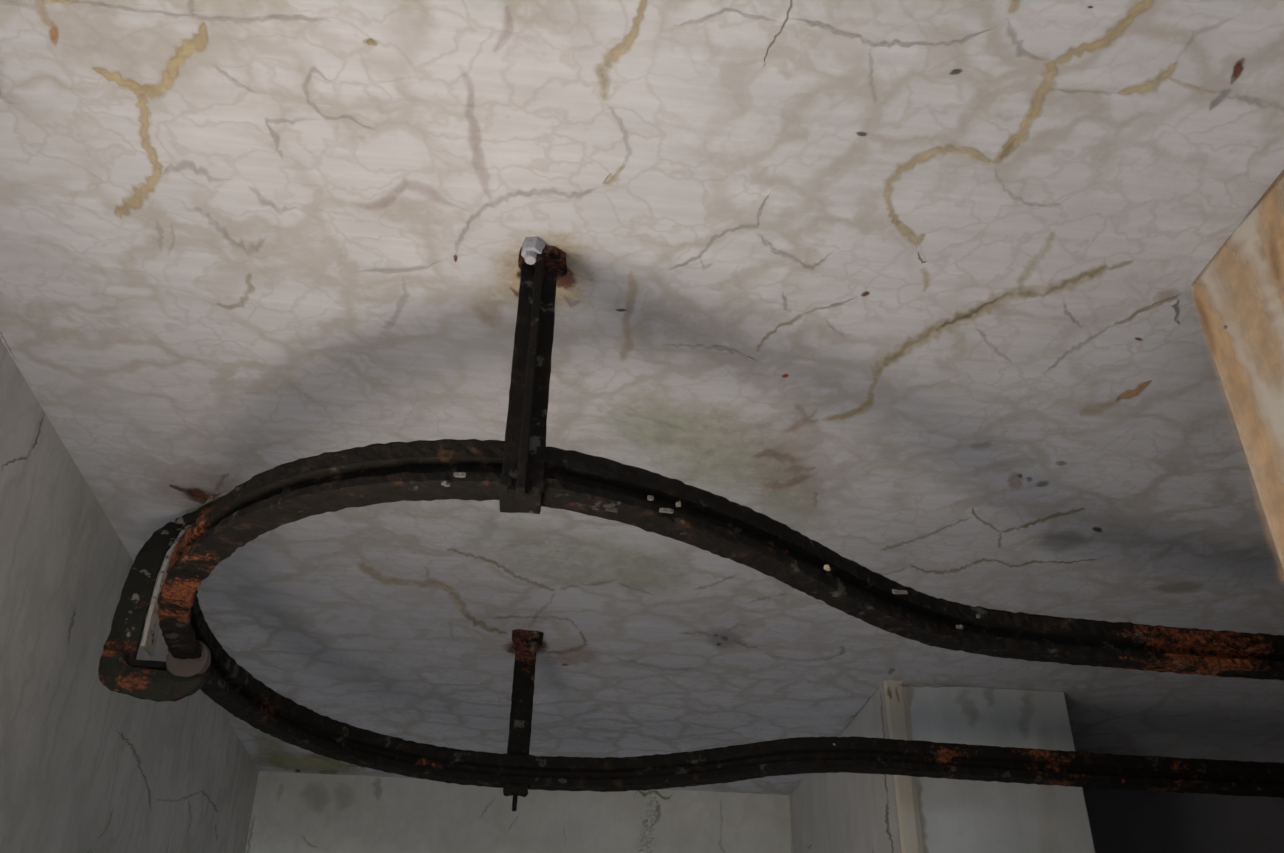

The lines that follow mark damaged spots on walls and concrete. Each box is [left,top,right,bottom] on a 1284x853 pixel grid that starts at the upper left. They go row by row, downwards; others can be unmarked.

crack [600,0,646,84]
crack [764,0,974,62]
crack [1121,65,1174,94]
crack [93,23,208,216]
crack [886,0,1153,224]
rust [510,261,521,296]
rust [555,247,579,303]
crack [941,299,997,327]
crack [1121,296,1179,323]
crack [3,419,43,466]
crack [911,508,1095,573]